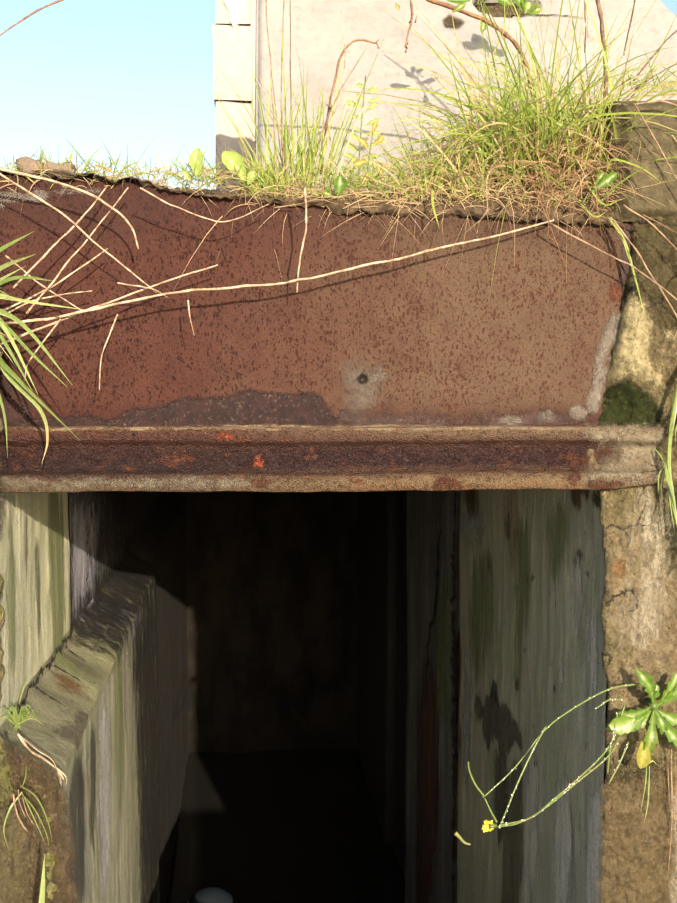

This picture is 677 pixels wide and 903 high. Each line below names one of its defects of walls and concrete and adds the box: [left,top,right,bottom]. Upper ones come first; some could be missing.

rust [610,224,631,302]
rust [0,314,620,441]
rust [564,448,625,490]
damp [0,476,254,903]